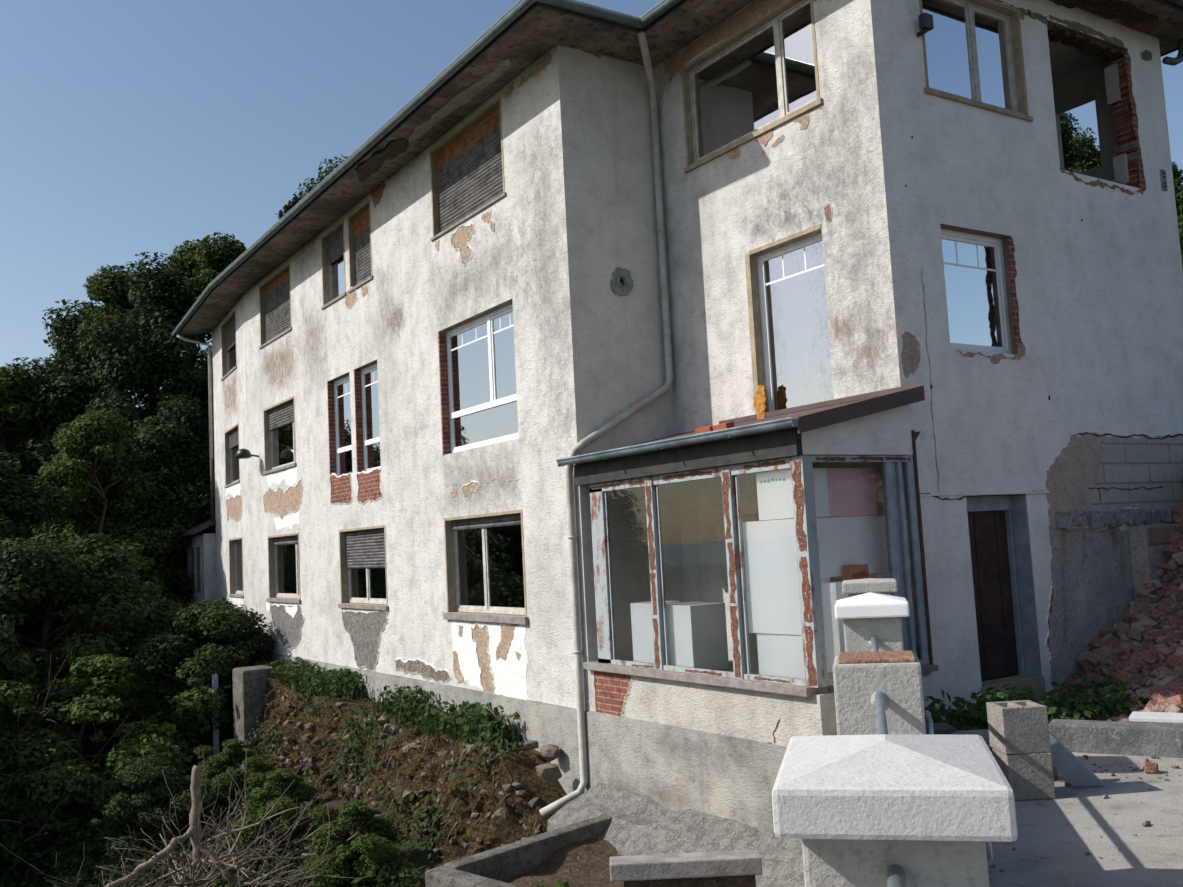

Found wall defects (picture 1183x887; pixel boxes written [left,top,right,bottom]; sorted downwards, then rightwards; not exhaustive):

flaking render [994,0,1152,195]
flaking render [899,329,921,380]
crack [920,267,967,500]
peeling [263,476,303,530]
corrosion [592,471,789,683]
corrosion [743,460,817,686]
spalling [1045,432,1183,723]
flaking render [266,603,305,651]
flaking render [342,609,389,672]
flaking render [395,651,466,685]
peeling [458,621,521,694]
flaking render [593,663,634,717]